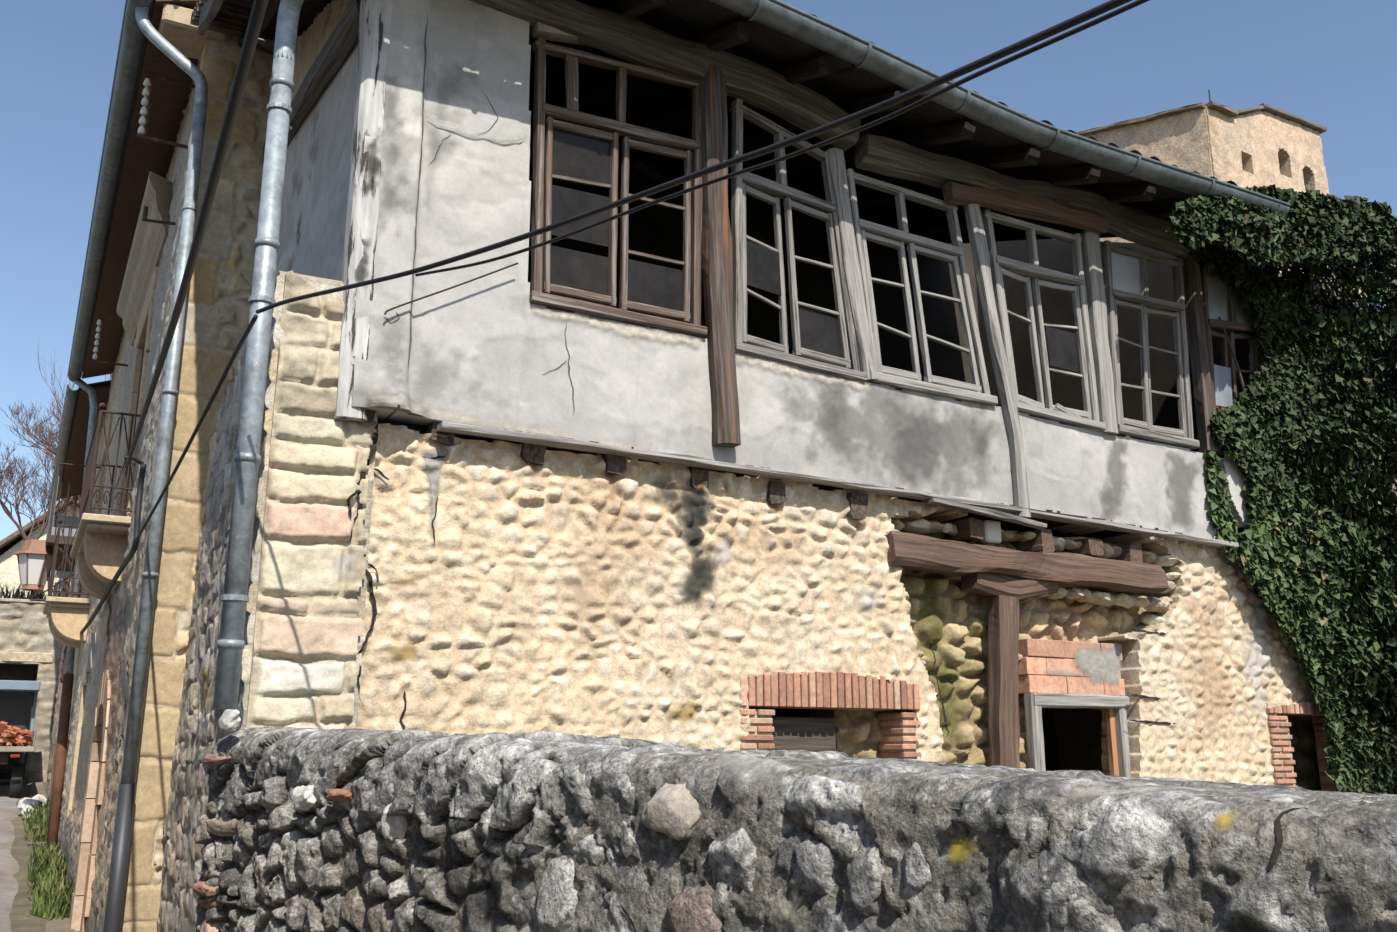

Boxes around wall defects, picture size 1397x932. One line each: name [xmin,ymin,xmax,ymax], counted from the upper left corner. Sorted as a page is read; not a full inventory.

crack [384,17,525,369]
crack [543,323,575,415]
crack [347,422,389,709]
crack [430,496,438,544]
leakage [661,485,729,601]
crack [399,690,407,730]